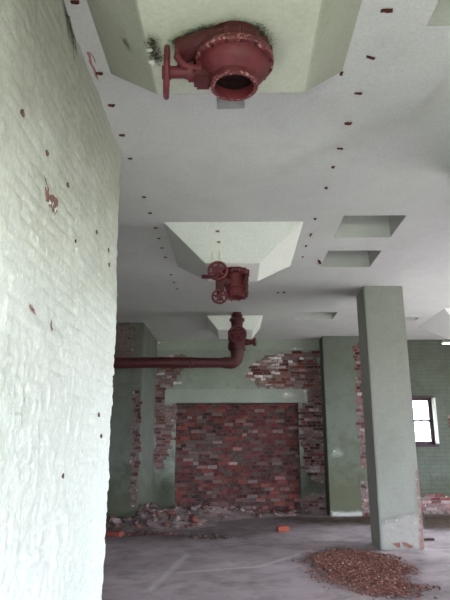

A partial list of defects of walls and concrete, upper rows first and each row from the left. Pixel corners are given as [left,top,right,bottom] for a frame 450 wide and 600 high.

water stain [143,18,294,69]
spalling [44,177,58,215]
spalling [128,388,143,507]
flaking render [153,368,184,469]
flaking render [245,347,345,484]
spalling [352,342,367,469]
spalling [360,478,370,517]
peeling [380,469,450,550]